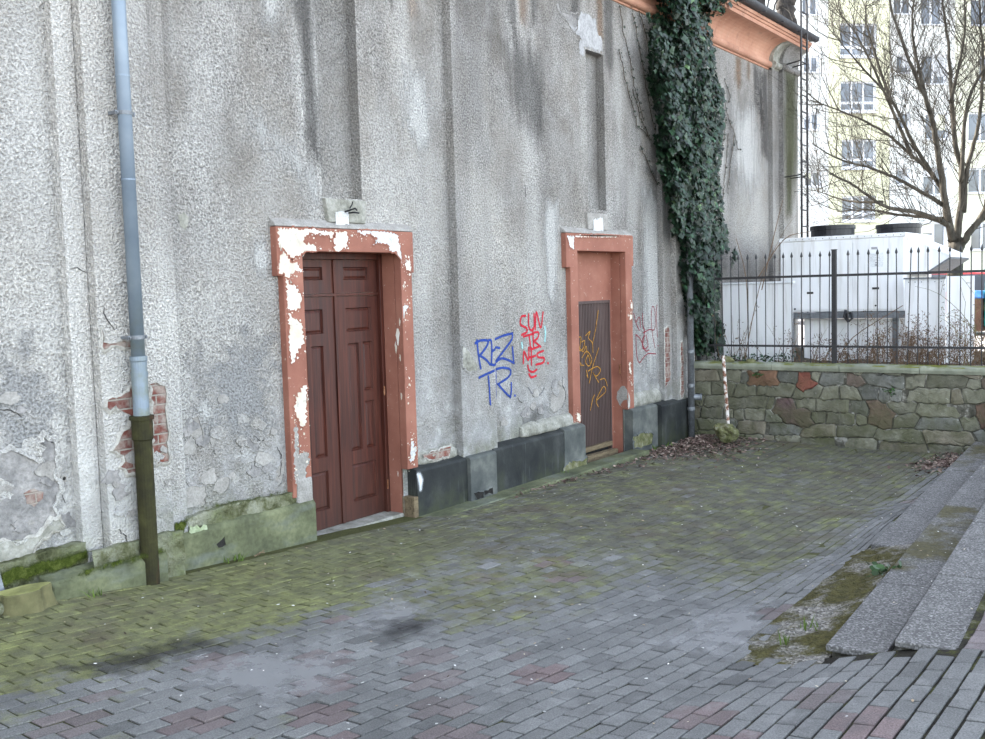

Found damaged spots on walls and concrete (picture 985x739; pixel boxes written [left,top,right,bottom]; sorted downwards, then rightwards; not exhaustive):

peeling [555,2,603,56]
peeling [276,211,412,404]
peeling [0,391,28,414]
flaking render [0,430,76,562]
flaking render [101,384,138,524]